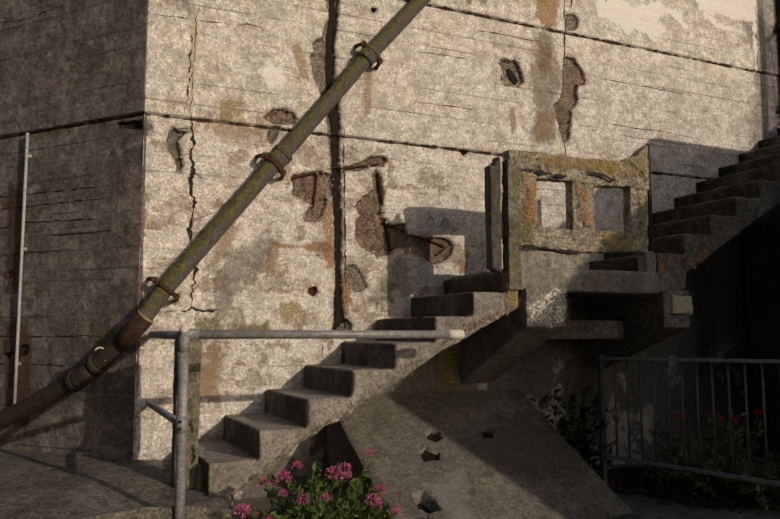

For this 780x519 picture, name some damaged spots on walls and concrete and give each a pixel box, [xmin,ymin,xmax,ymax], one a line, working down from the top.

crack [156,8,261,244]
spalling [264,108,297,144]
crack [310,0,356,330]
spalling [499,59,524,87]
crack [477,0,573,105]
rust [535,0,559,28]
spalling [554,57,586,144]
spalling [290,155,454,264]
crack [164,266,220,321]